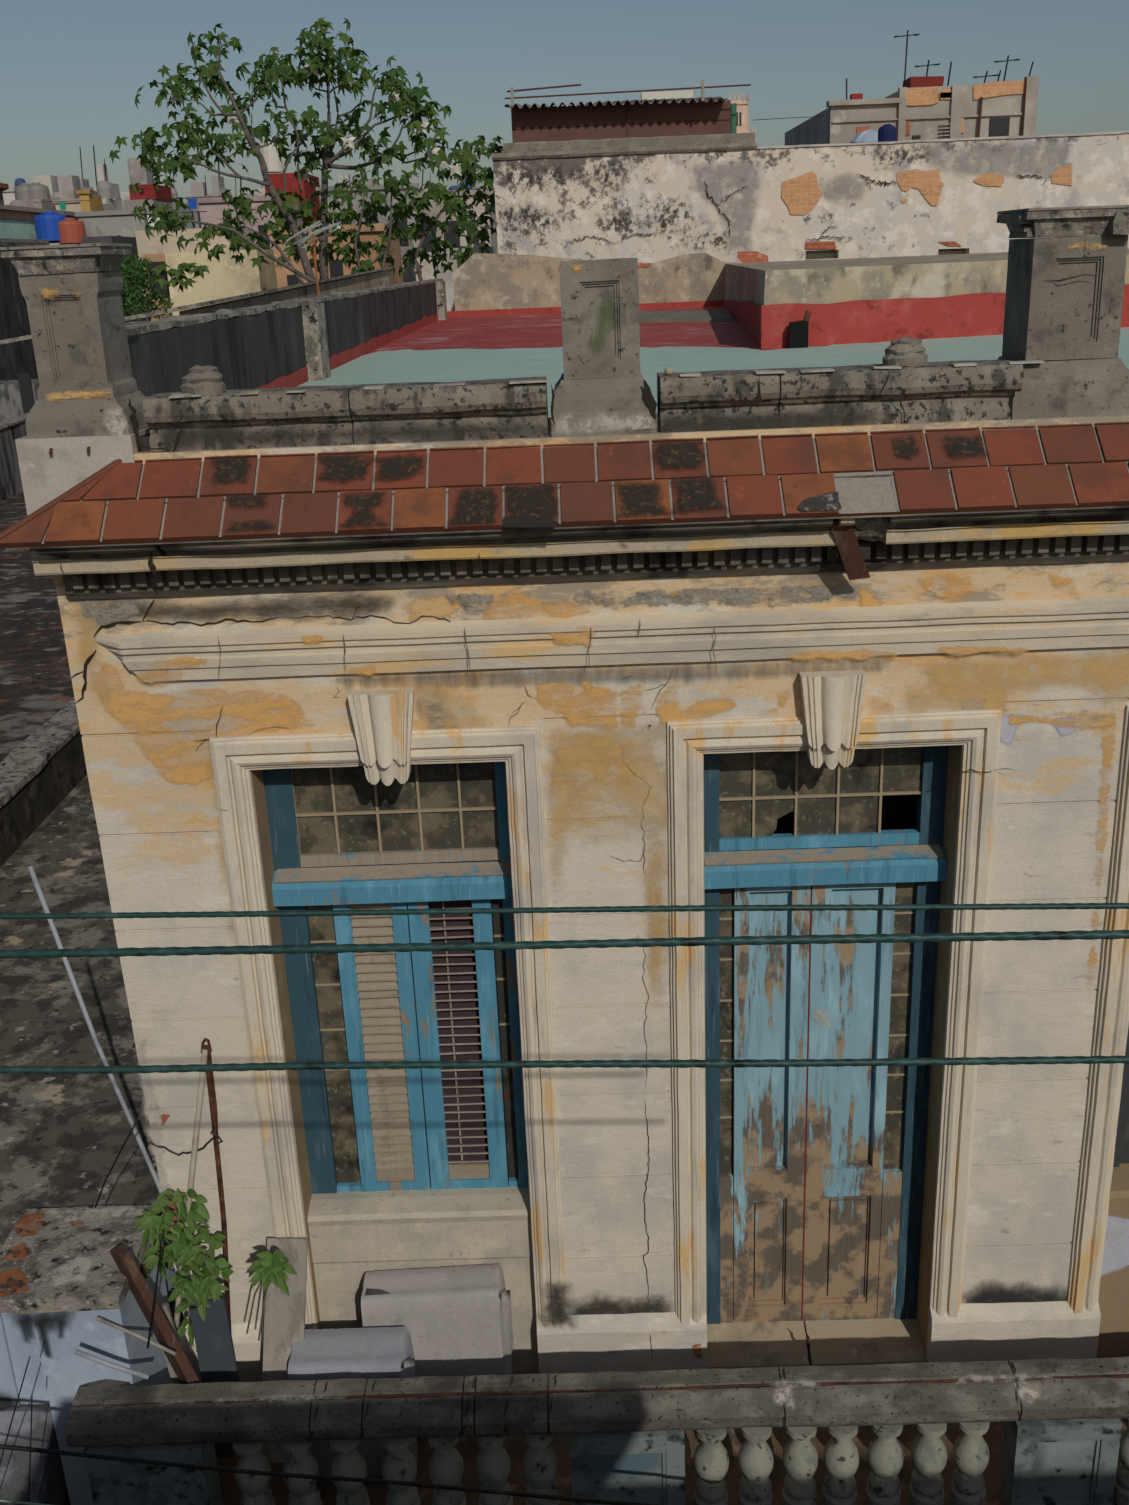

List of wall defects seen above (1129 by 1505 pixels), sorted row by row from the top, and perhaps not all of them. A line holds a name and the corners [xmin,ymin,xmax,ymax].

spalling [906,80,1025,106]
damp [501,161,624,188]
spalling [781,171,862,215]
spalling [897,117,1072,206]
damp [500,206,554,237]
damp [598,211,639,233]
damp [656,199,727,248]
spalling [81,598,139,625]
peeling [100,656,311,785]
peeling [536,681,736,864]
crack [608,747,651,887]
crack [637,936,660,1360]